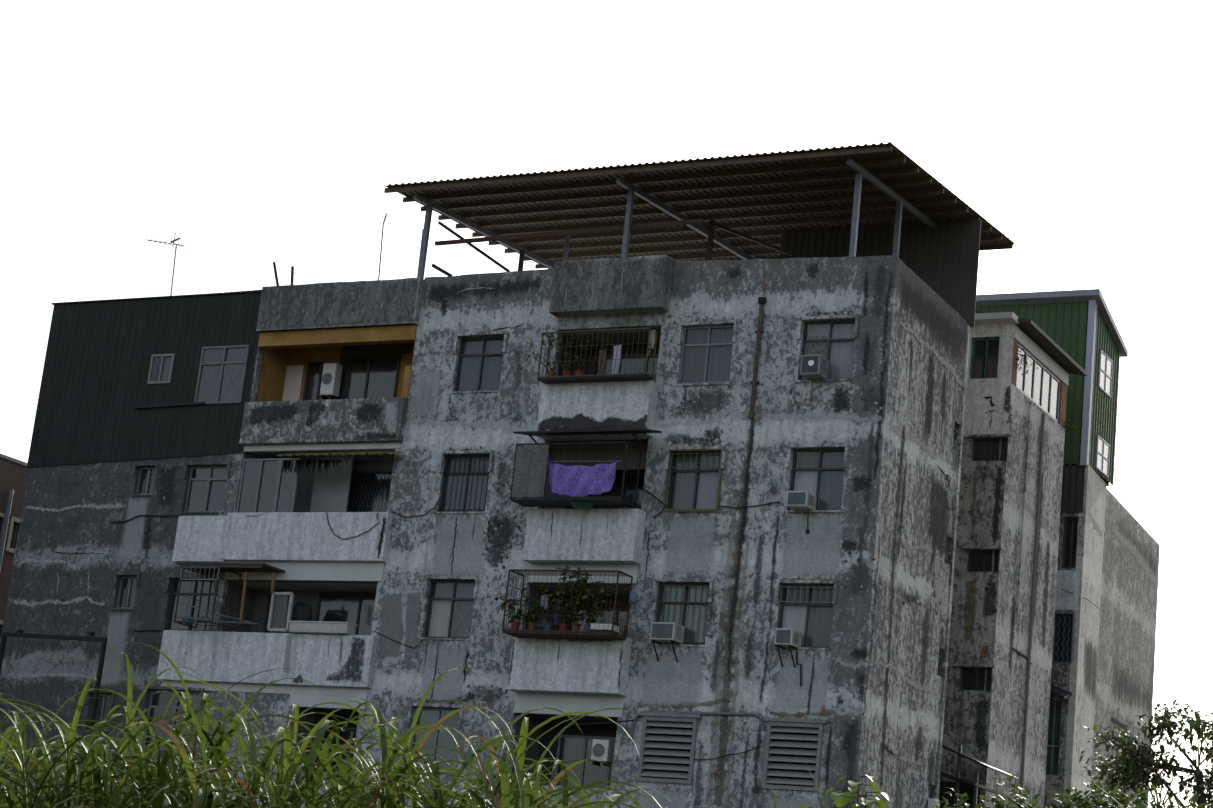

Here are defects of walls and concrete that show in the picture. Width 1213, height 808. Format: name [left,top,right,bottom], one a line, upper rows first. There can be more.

water stain [429,279,541,317]
water stain [249,401,329,427]
water stain [349,348,648,458]
water stain [27,504,122,512]
water stain [662,266,964,808]
water stain [14,550,107,607]
water stain [326,637,366,682]